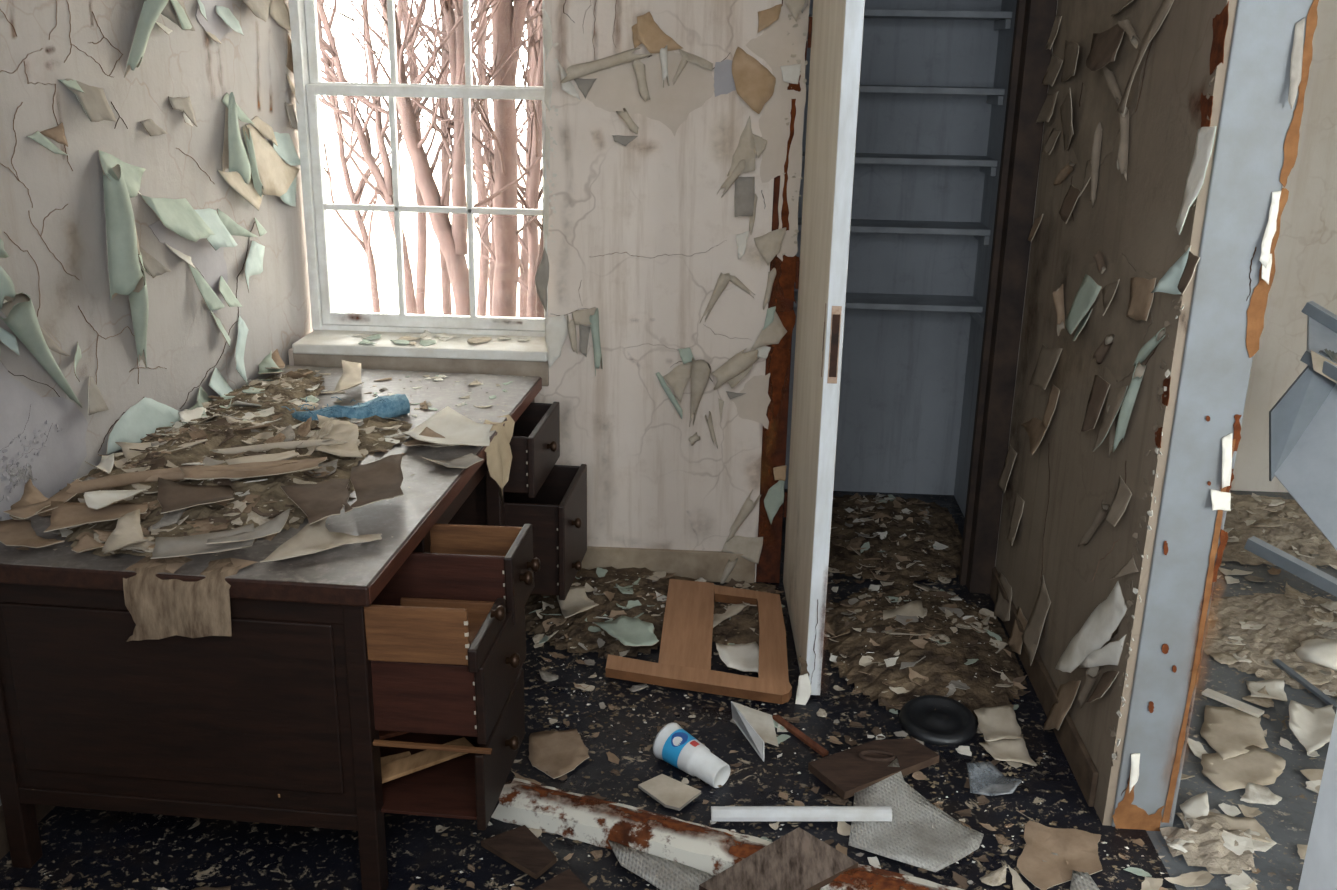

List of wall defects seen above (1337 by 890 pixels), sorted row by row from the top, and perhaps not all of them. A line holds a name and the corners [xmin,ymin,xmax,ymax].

crack [0,0,162,385]
peeling [0,0,338,554]
peeling [535,0,809,448]
peeling [1036,0,1174,224]
peeling [1246,191,1281,301]
peeling [1288,18,1305,110]
peeling [720,465,787,583]
peeling [994,126,1217,730]
peeling [1211,433,1233,511]